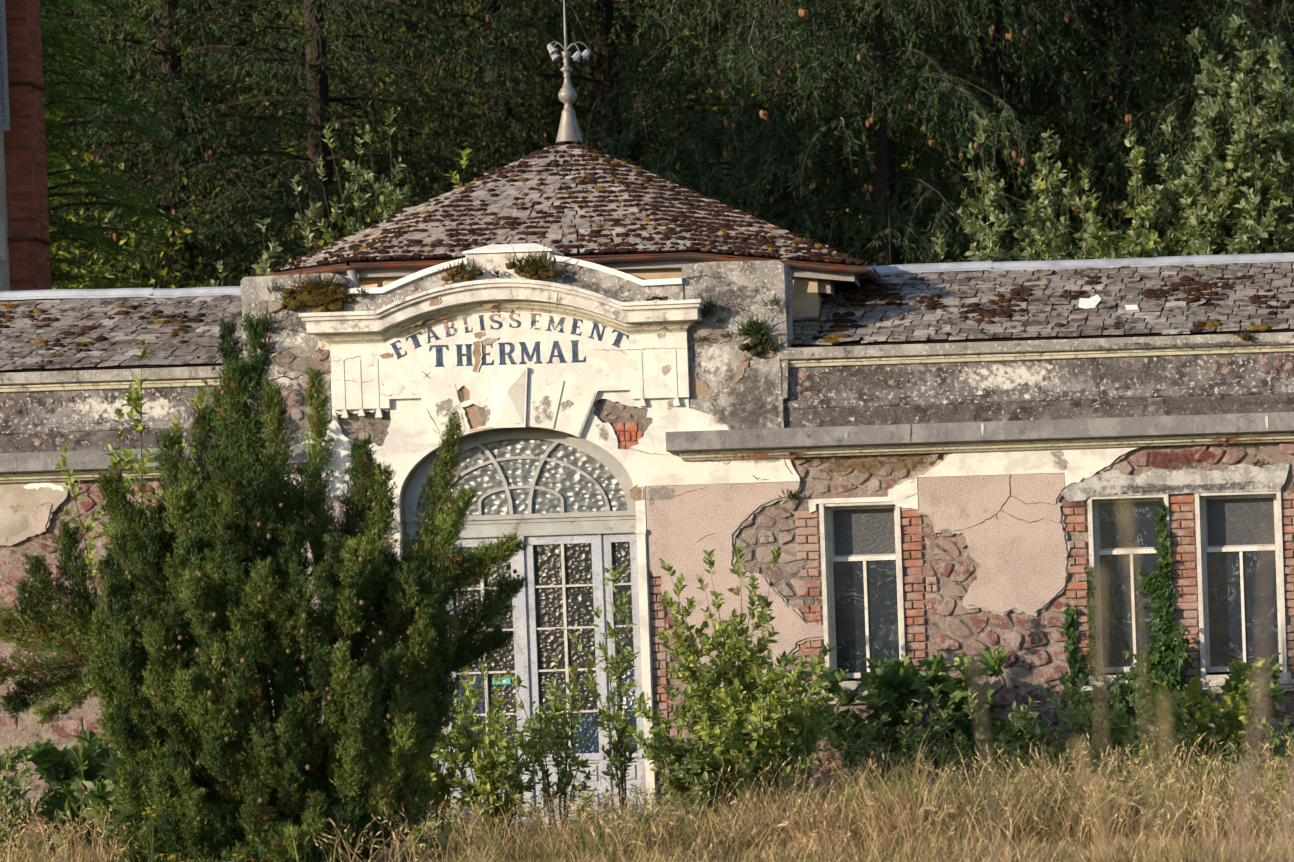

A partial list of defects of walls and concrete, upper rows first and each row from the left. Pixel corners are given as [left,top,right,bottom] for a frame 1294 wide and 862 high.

water stain [800,369,929,394]
water stain [959,341,1288,390]
water stain [69,397,178,422]
flaking render [458,386,487,429]
flaking render [594,399,653,450]
water stain [813,408,962,437]
flaking render [1112,444,1246,475]
crack [969,474,1062,528]
flaking render [0,481,120,606]
flaking render [734,453,939,697]
flaking render [649,573,706,745]
flaking render [900,500,1090,771]